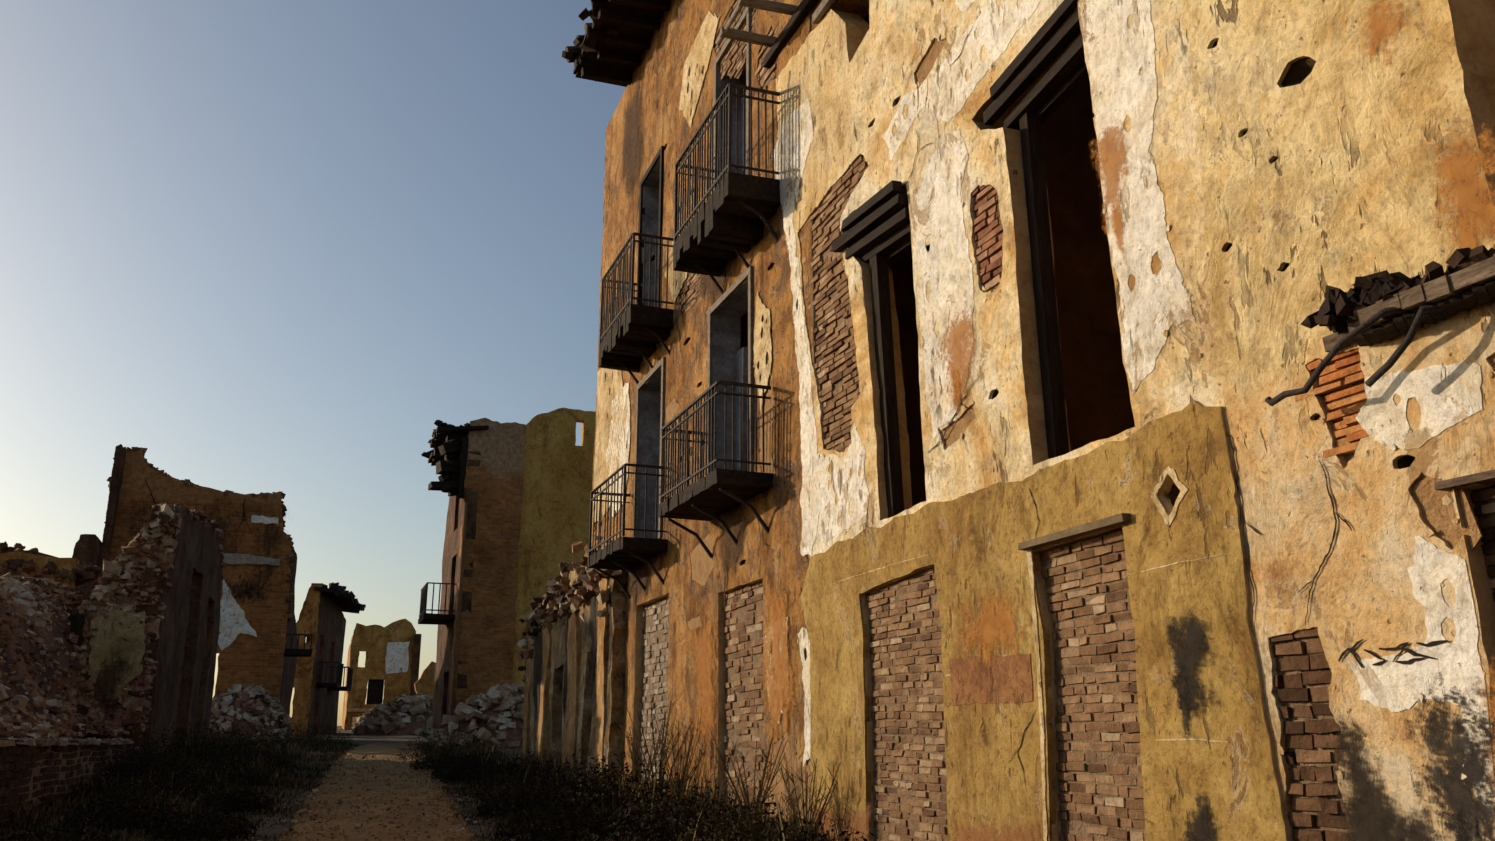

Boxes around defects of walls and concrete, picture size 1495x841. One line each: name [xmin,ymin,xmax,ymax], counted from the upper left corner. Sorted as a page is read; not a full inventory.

peeling [753,291,776,478]
spalling [760,98,870,556]
peeling [882,0,1041,449]
peeling [1078,0,1196,395]
damp [1166,611,1218,737]
crack [1225,427,1262,636]
crack [1297,460,1352,625]
peeling [1270,344,1495,841]
damp [1178,794,1219,841]